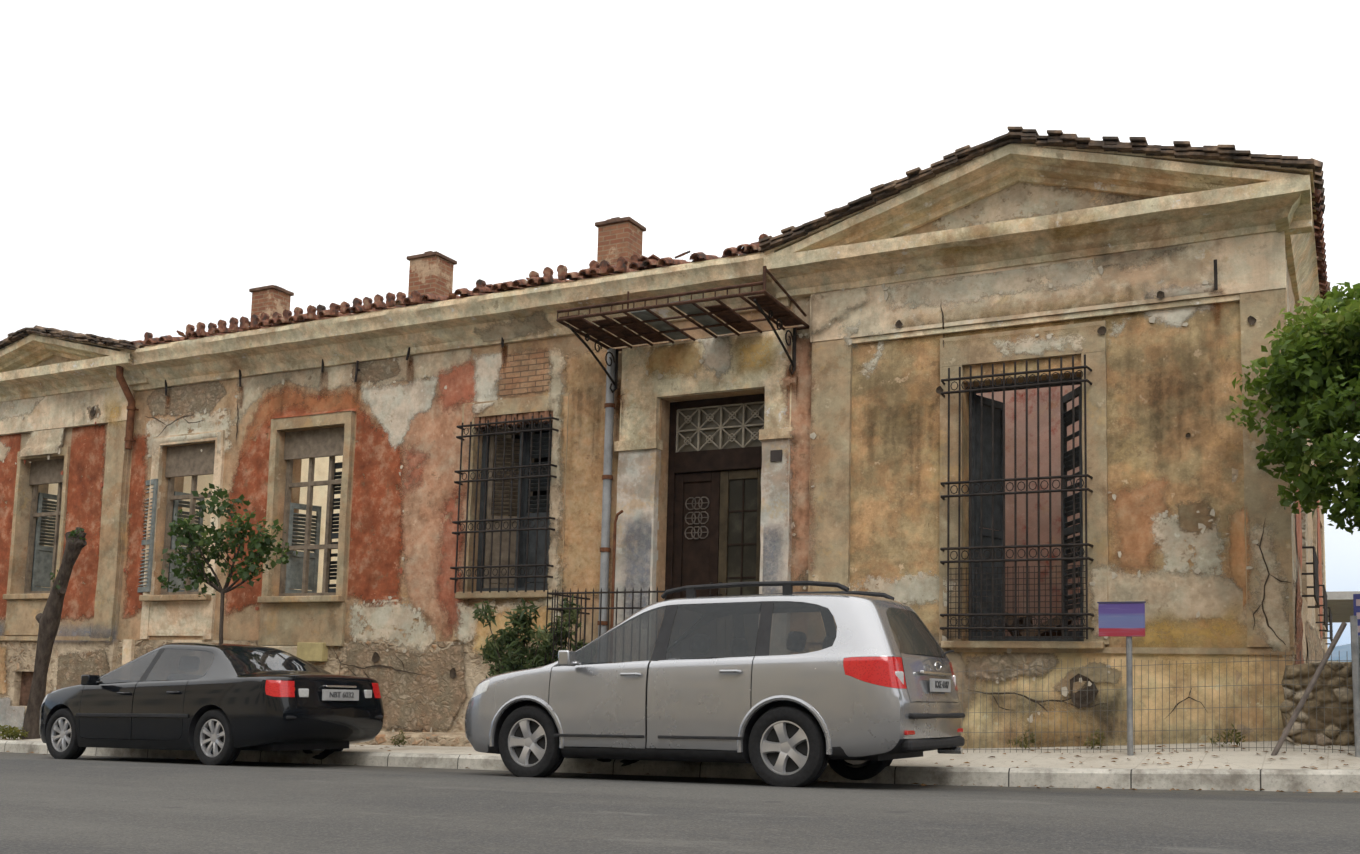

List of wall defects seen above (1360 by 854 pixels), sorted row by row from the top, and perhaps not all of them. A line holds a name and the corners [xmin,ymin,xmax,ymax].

peeling [0,397,106,621]
peeling [123,347,564,732]
peeling [1088,500,1325,665]
crack [1252,518,1294,658]